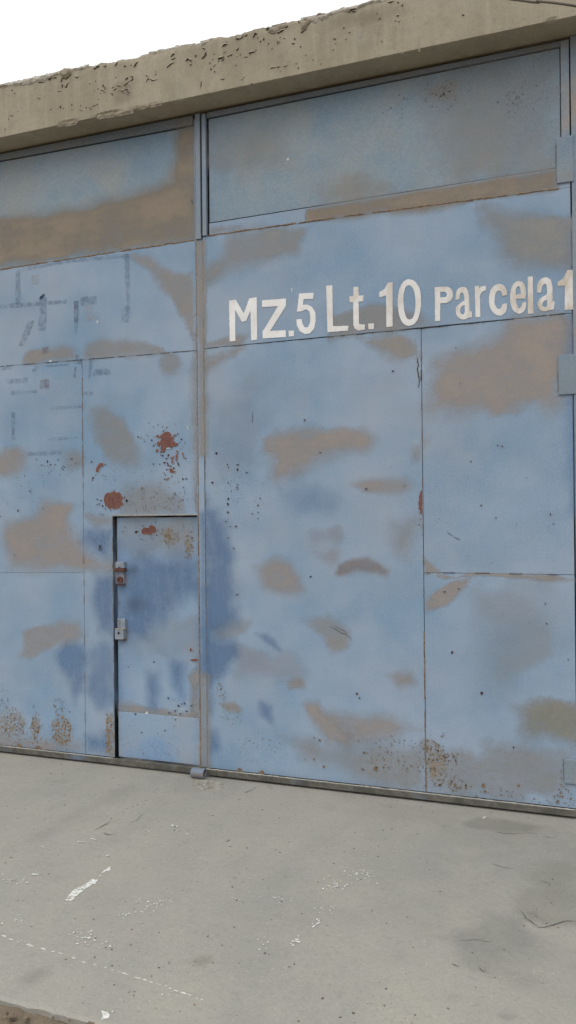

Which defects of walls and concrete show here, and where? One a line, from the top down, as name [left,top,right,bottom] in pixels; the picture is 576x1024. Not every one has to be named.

spalling [146,0,403,82]
spalling [0,62,138,95]
corrosion [0,691,76,750]
corrosion [358,733,486,797]